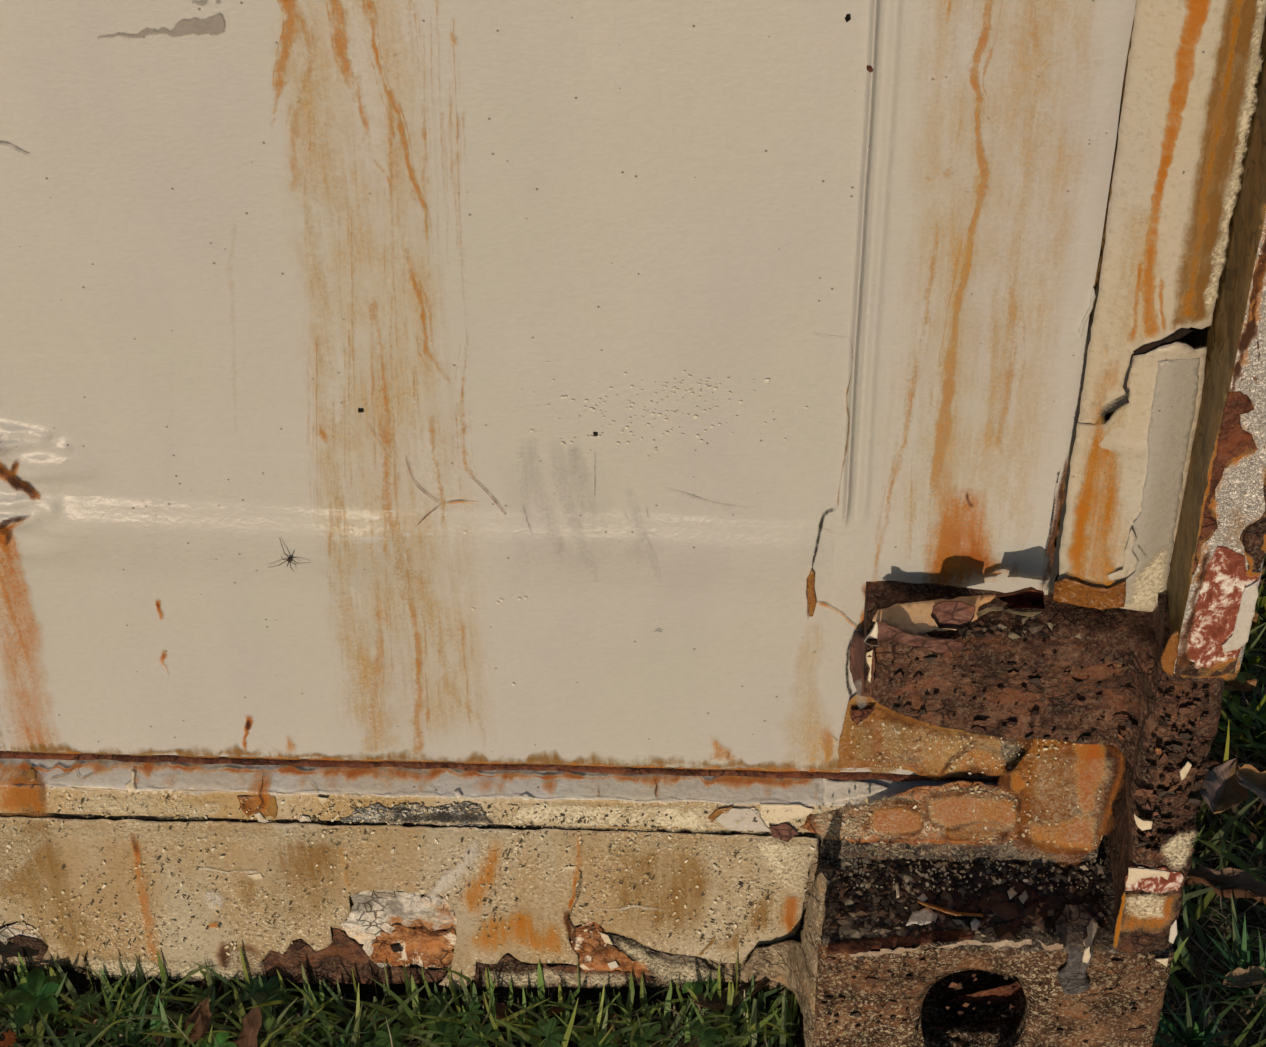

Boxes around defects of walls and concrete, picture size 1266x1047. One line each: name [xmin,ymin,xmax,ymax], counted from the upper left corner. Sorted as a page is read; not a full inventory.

corrosion [1131,0,1266,338]
corrosion [932,5,998,487]
crack [842,377,851,469]
crack [1042,288,1194,592]
corrosion [1161,239,1266,679]
crack [806,501,866,629]
corrosion [0,634,846,952]
corrosion [769,781,1020,845]
corrosion [217,928,446,985]
spalling [340,890,457,969]
crack [561,841,580,948]
corrosion [474,914,723,989]